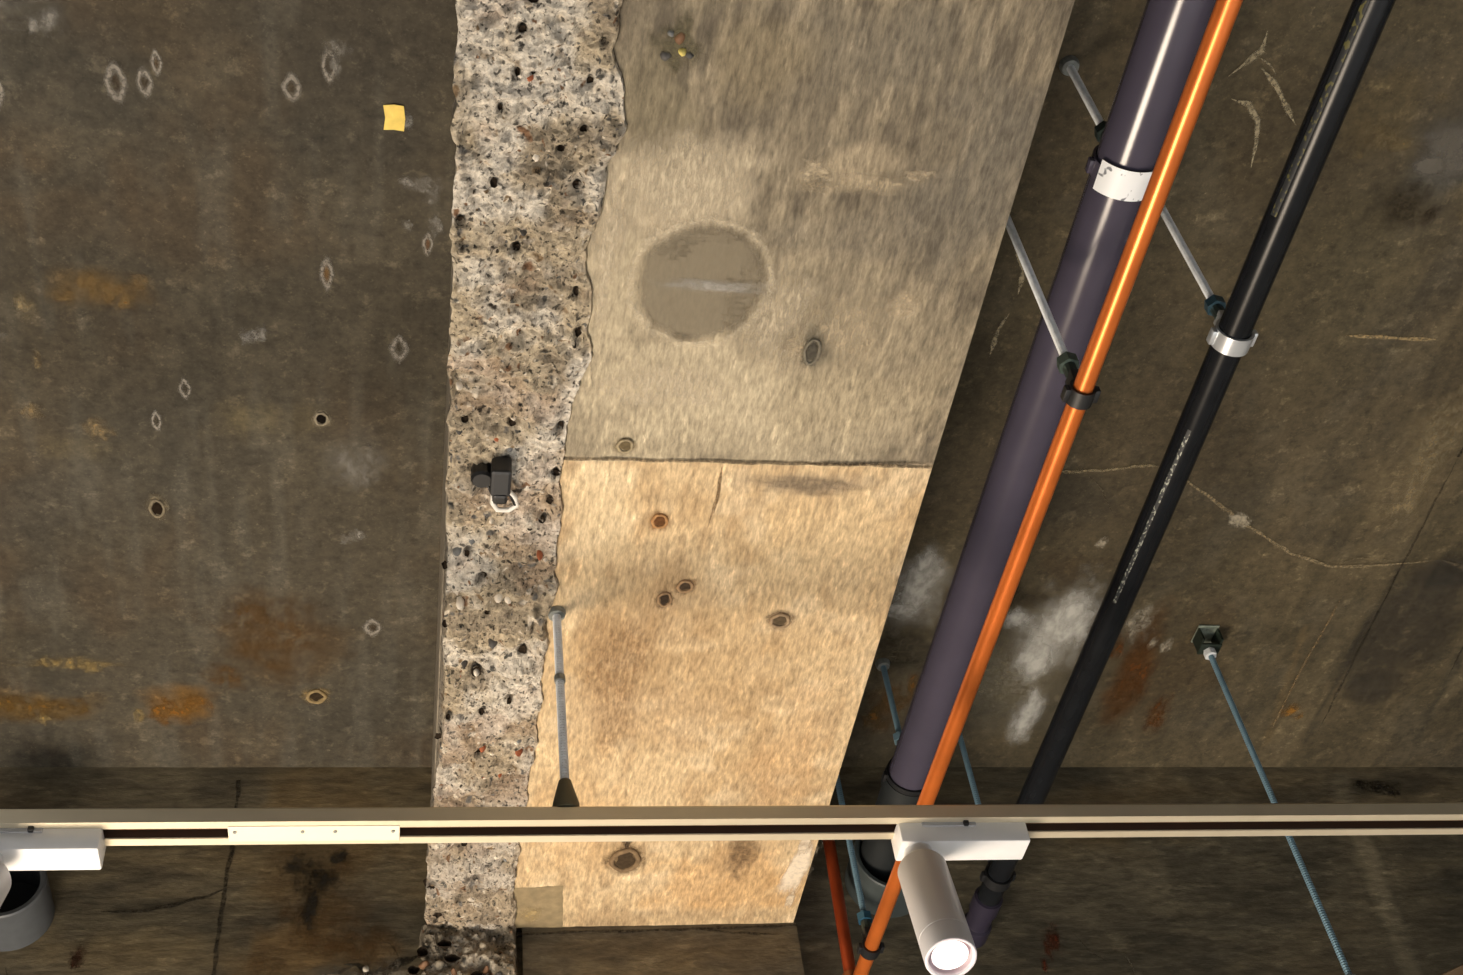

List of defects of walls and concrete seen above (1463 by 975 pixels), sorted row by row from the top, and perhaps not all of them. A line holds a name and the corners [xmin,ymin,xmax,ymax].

water stain [889,552,944,615]
water stain [879,632,926,664]
water stain [977,589,1094,738]
crack [233,780,241,808]
crack [101,845,234,975]
crack [332,938,417,975]